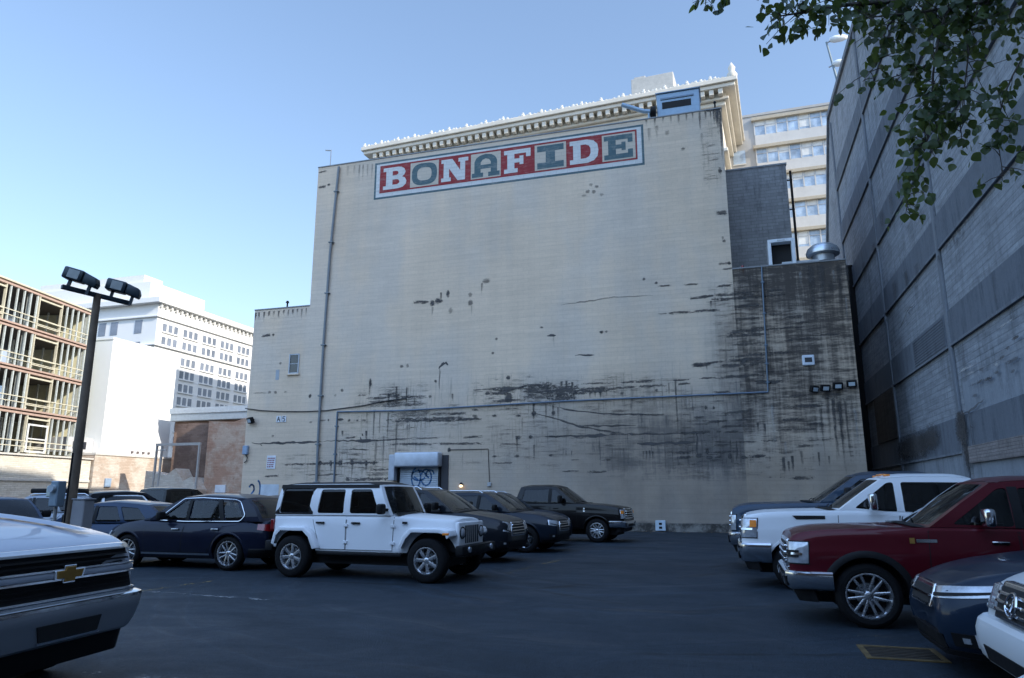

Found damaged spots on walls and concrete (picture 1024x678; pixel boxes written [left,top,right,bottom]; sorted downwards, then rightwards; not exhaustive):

water stain [822,390,848,449]